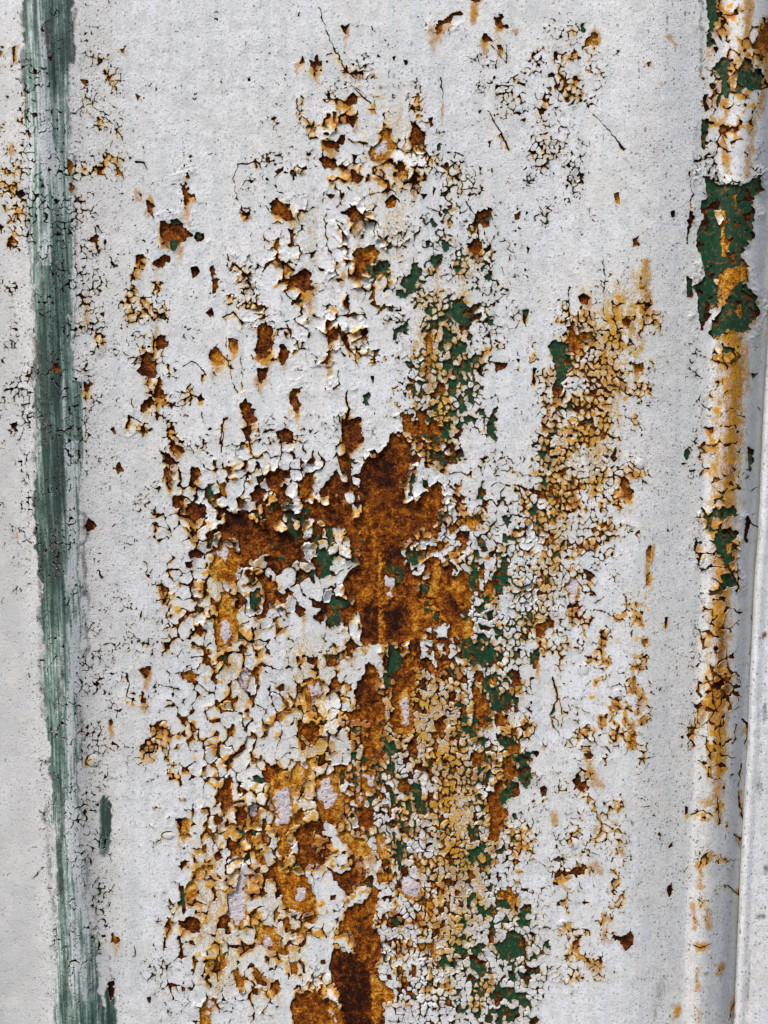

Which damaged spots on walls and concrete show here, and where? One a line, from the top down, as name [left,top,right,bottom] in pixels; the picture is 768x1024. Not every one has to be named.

crack [168,171,199,225]
crack [232,159,259,220]
crack [465,199,483,257]
peeling [470,1,619,232]
rust [716,0,768,177]
crack [183,361,229,462]
peeling [40,45,663,1024]
rust [533,259,652,623]
peeling [661,0,768,789]
rust [710,329,751,532]
rust [202,288,492,1024]
crack [549,676,566,733]